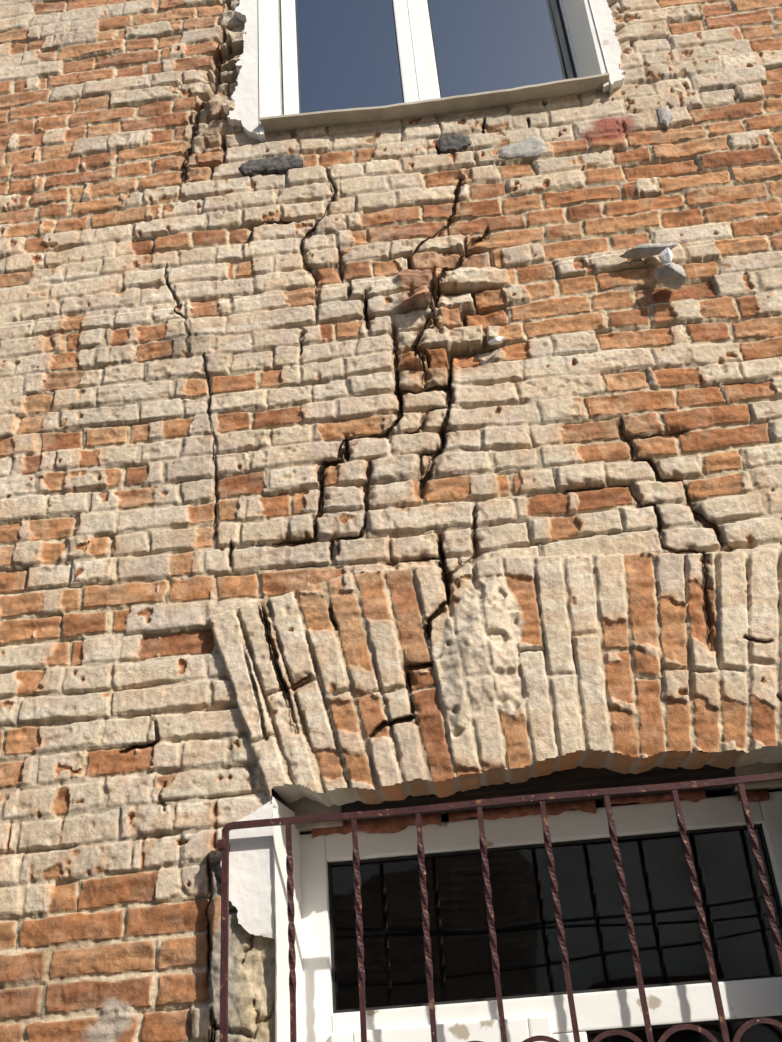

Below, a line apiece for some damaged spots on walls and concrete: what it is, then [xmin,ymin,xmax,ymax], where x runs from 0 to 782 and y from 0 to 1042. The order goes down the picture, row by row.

crack [165,266,233,563]
flaking render [184,368,283,396]
crack [243,169,368,323]
crack [272,226,488,559]
flaking render [440,288,675,360]
flaking render [351,81,782,259]
flaking render [560,367,778,500]
flaking render [597,247,782,360]
crack [566,418,732,649]
crack [244,602,310,740]
crack [369,508,476,736]
peeling [311,790,706,839]